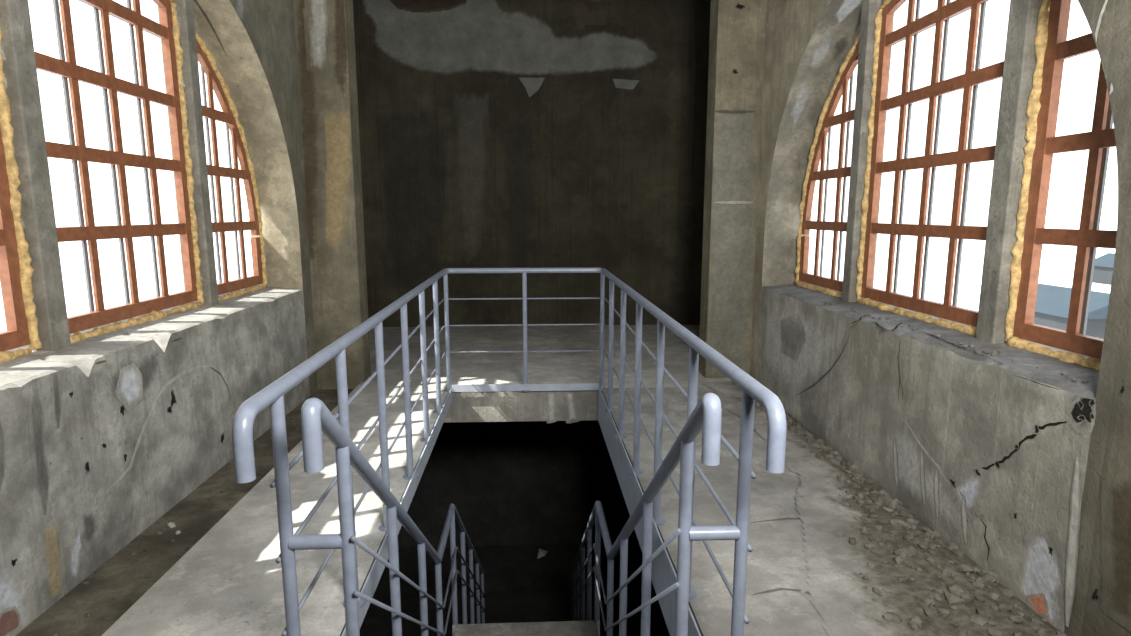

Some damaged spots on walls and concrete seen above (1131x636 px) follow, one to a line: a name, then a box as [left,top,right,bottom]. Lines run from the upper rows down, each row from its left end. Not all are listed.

peeling [354,0,663,98]
crack [850,316,1067,561]
spalling [1064,393,1097,435]
crack [751,516,801,524]
flaking render [1018,529,1065,630]